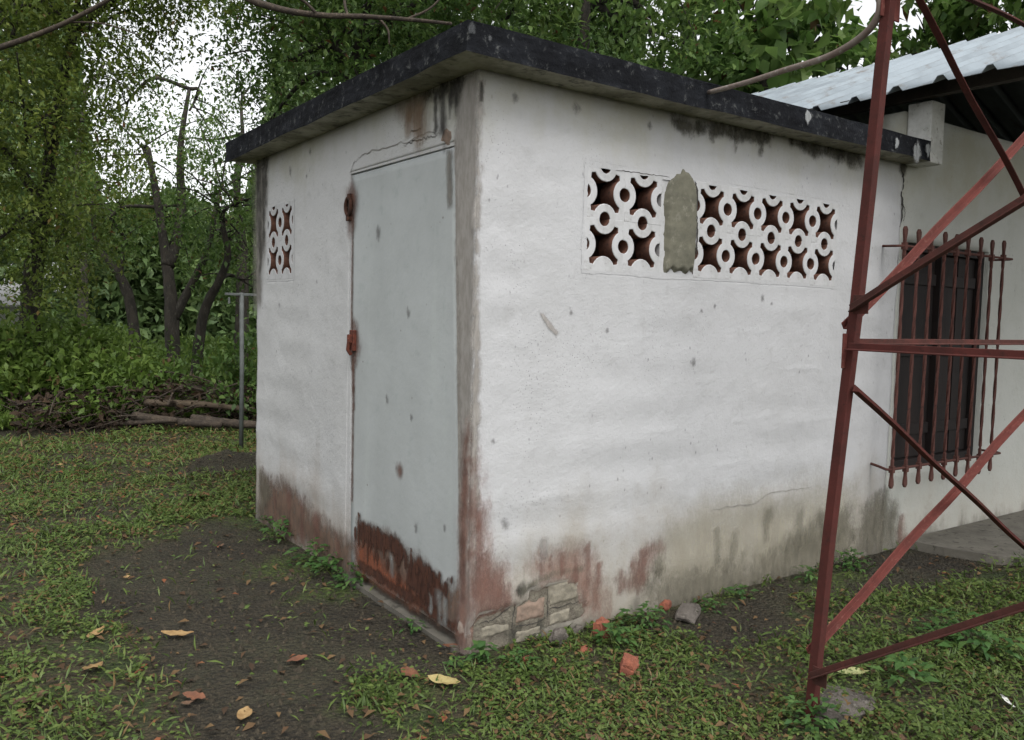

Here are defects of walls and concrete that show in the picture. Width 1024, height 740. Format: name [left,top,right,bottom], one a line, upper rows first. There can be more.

water stain [406,77,463,134]
water stain [672,117,771,155]
water stain [789,138,863,167]
rust [259,436,470,647]
water stain [658,517,823,607]
water stain [833,499,899,564]
spalling [471,575,585,653]